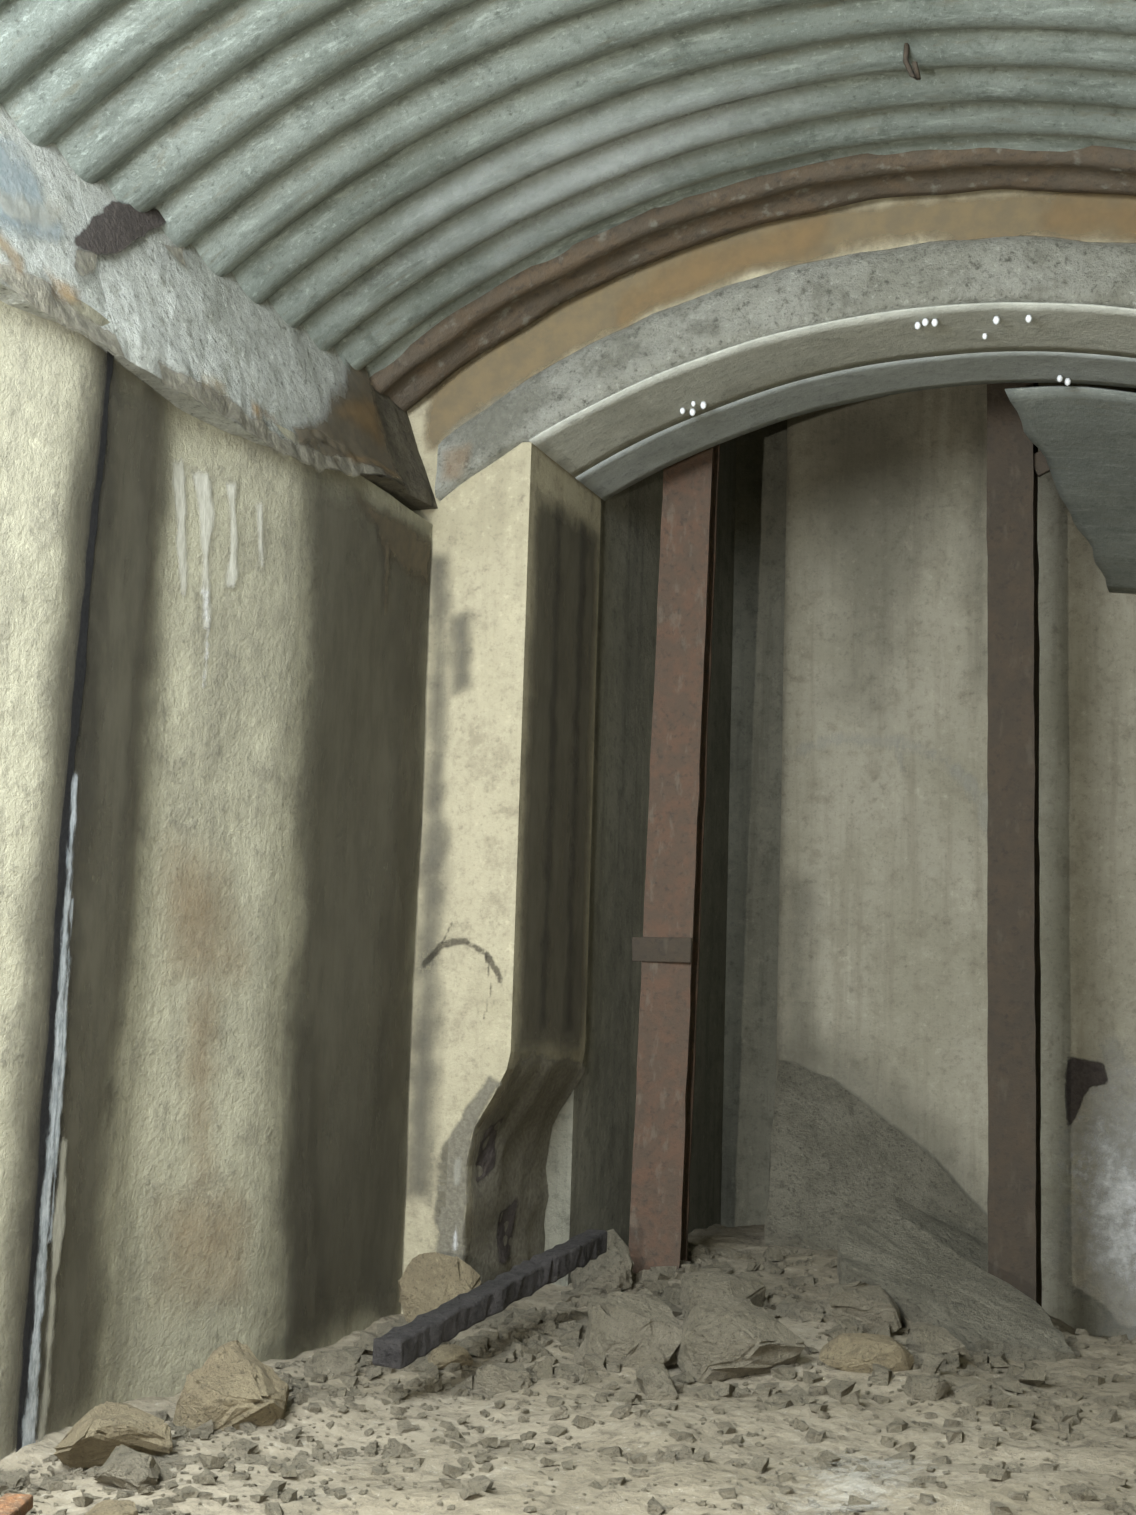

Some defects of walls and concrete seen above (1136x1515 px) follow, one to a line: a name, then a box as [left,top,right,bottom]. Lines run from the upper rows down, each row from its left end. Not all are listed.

spalling [0,201,166,358]
corrosion [426,192,1136,447]
damp [1073,1122,1136,1285]